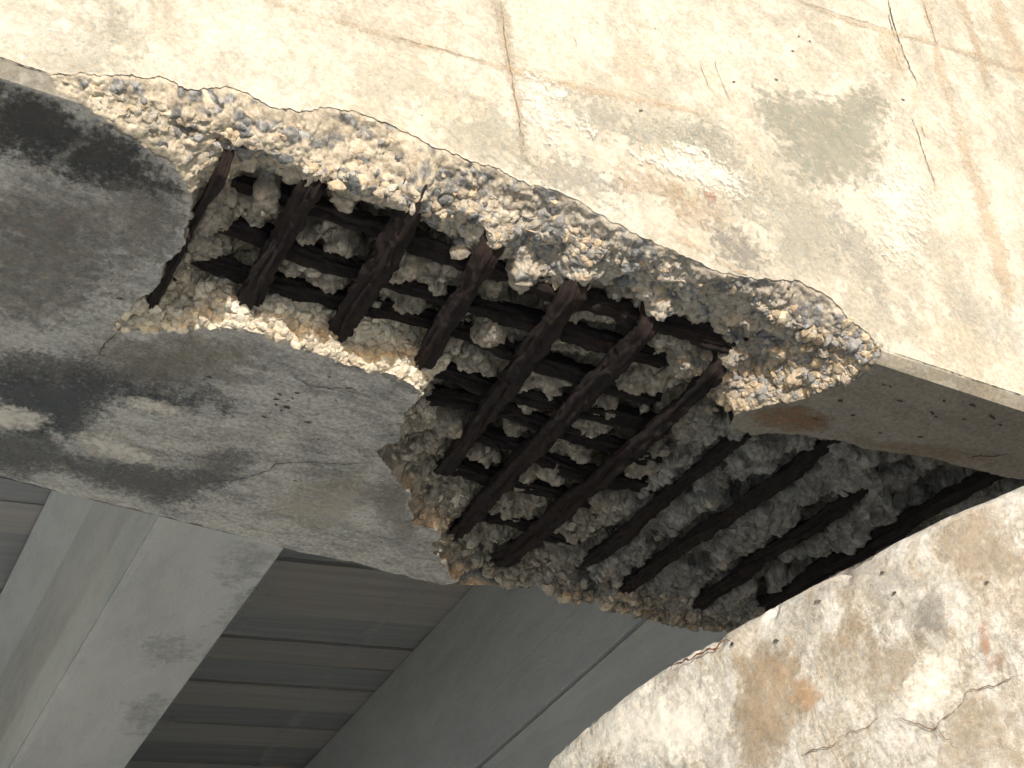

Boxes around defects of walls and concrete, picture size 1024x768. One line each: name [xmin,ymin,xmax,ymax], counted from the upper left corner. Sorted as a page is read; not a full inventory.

water stain [0,81,183,205]
crack [388,3,524,144]
water stain [554,88,888,301]
water stain [0,348,257,505]
corrosion [147,147,753,571]
spalling [50,72,979,646]
corrosion [618,407,841,594]
corrosion [692,488,869,610]
corrosion [756,471,1004,612]
spalling [904,477,1024,539]
crack [670,639,731,666]
crack [798,675,1021,756]